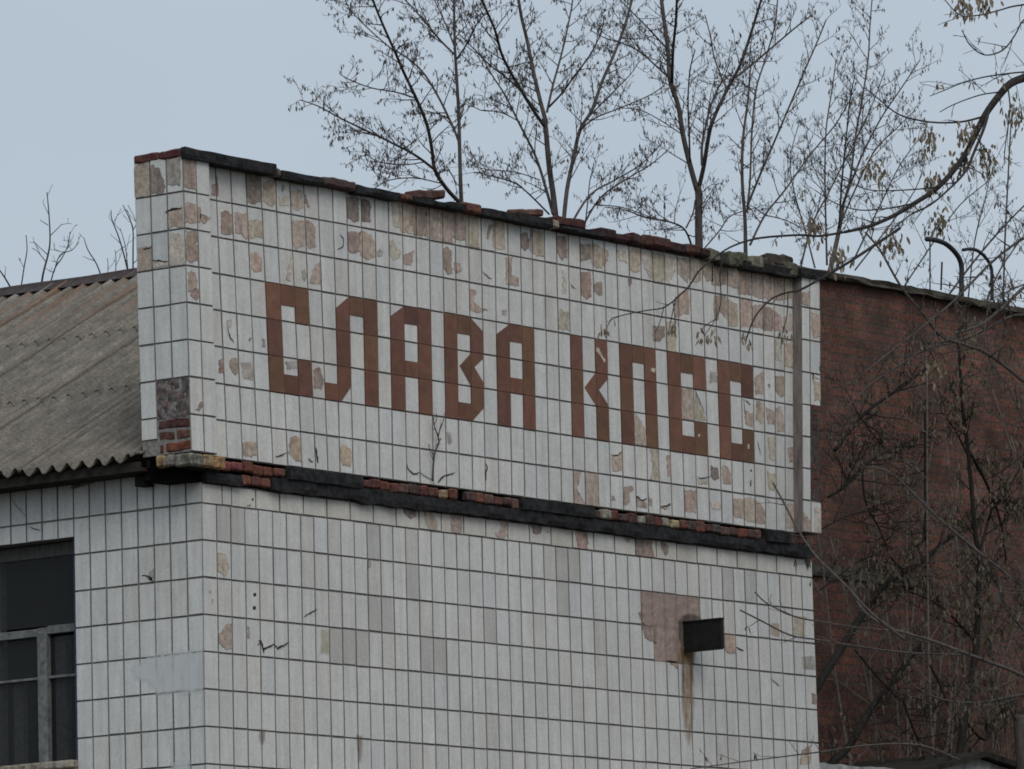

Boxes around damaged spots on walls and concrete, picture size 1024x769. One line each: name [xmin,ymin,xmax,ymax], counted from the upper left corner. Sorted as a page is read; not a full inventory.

peeling [134,157,196,198]
peeling [137,173,284,300]
peeling [347,196,820,491]
peeling [156,377,203,454]
peeling [340,444,352,467]
crack [407,465,455,483]
peeling [573,471,670,510]
peeling [624,537,669,558]
crack [258,640,289,652]
peeling [638,591,700,669]
rust [679,648,694,731]